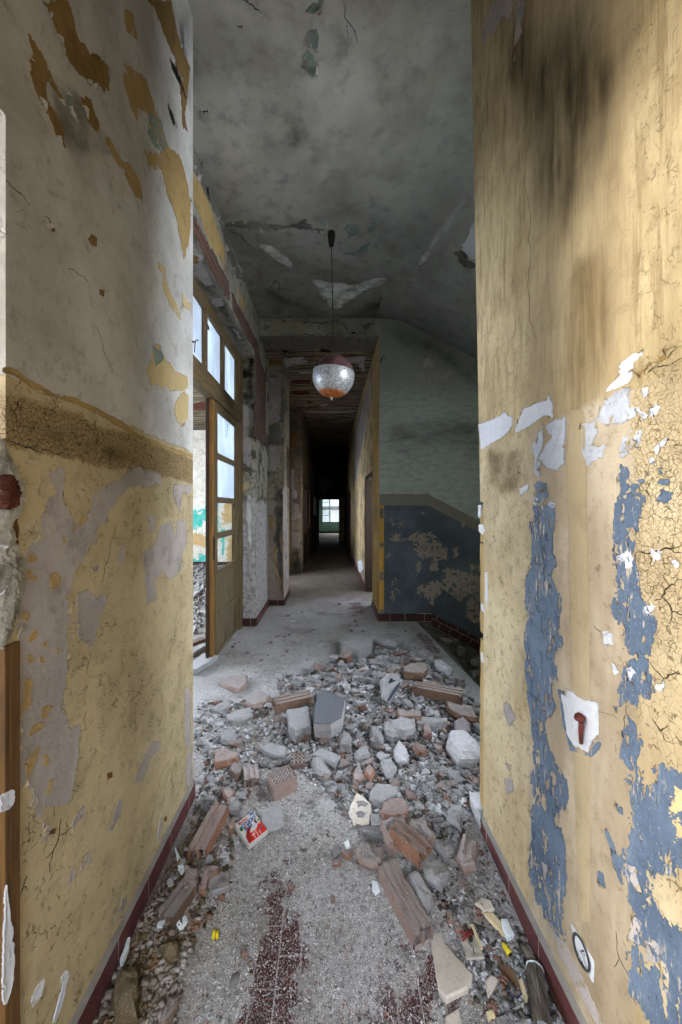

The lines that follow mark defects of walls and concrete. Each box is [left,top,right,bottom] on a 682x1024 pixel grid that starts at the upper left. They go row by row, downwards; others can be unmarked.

peeling [28,0,143,204]
peeling [123,0,324,600]
peeling [0,437,232,843]
peeling [385,517,488,624]
spalling [460,505,485,534]
peeling [478,396,605,1024]
peeling [579,344,682,1024]
crack [635,545,682,621]
peeling [1,885,15,1005]